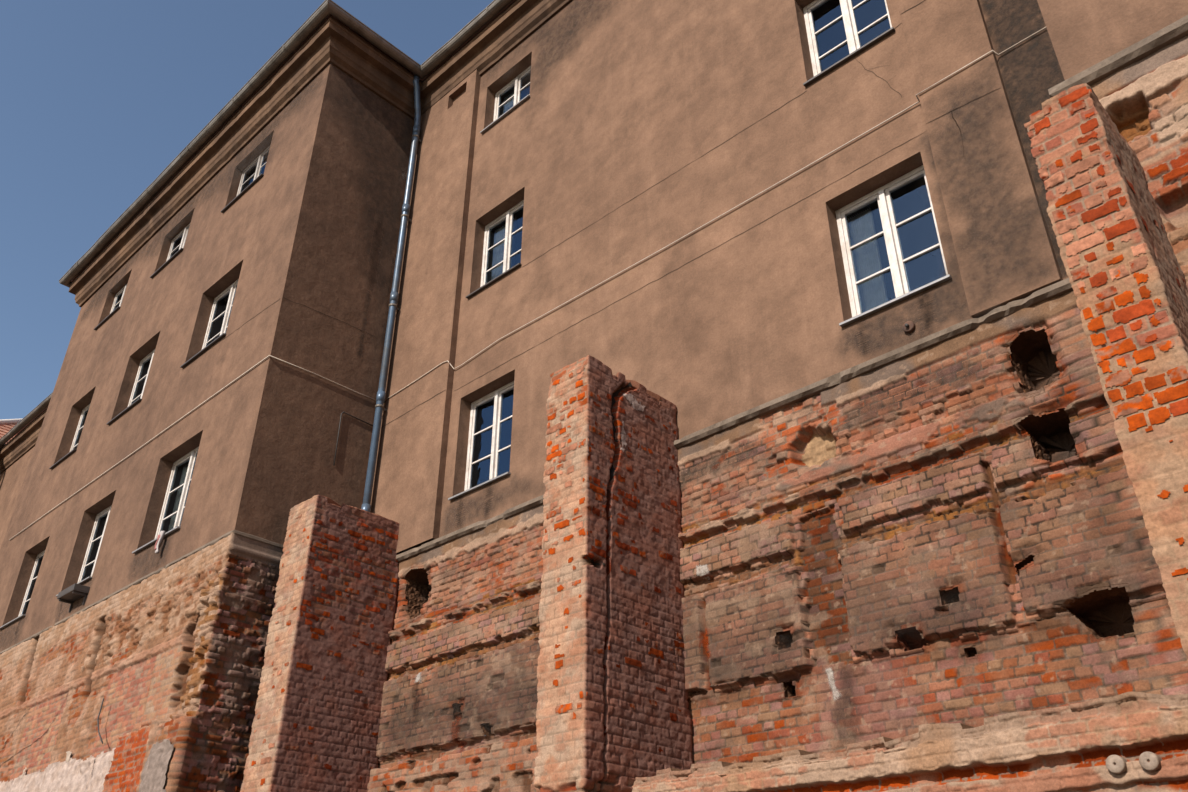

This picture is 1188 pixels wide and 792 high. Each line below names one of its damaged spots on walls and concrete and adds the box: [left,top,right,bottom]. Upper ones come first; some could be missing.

spalling [275,514,432,658]
crack [591,382,632,692]
spalling [1015,551,1038,575]
spalling [1058,583,1138,642]
peeling [0,748,116,792]
peeling [139,739,174,792]